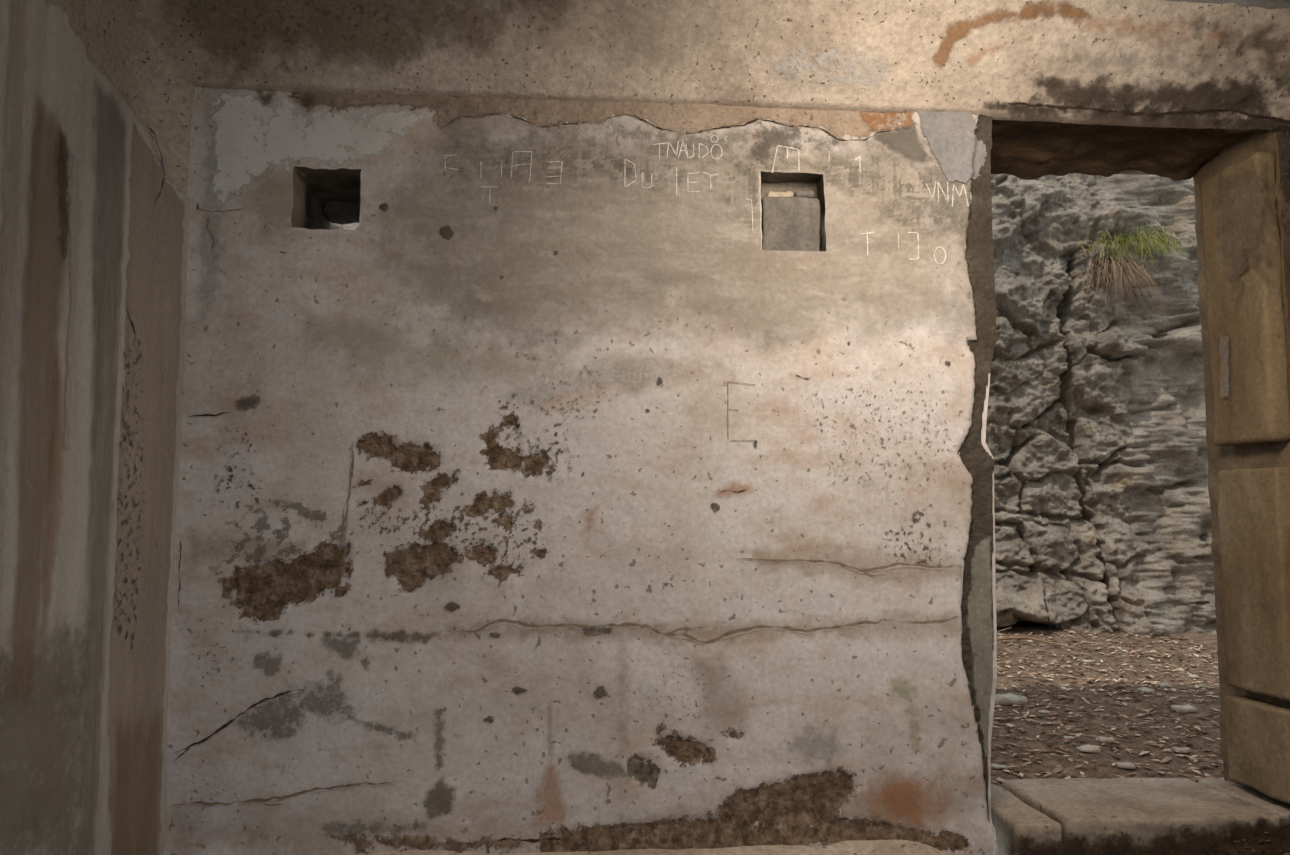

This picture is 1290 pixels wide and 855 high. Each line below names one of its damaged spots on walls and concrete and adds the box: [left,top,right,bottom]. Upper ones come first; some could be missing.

water stain [186,0,563,72]
corrosion [934,2,1089,66]
water stain [1216,25,1284,87]
water stain [986,102,1290,367]
water stain [1220,336,1229,397]
peeling [288,92,997,823]
flaking render [217,534,359,625]
crack [736,558,964,576]
crack [445,616,960,645]
crack [173,690,303,762]
crack [172,781,397,808]
flaking render [326,766,969,853]